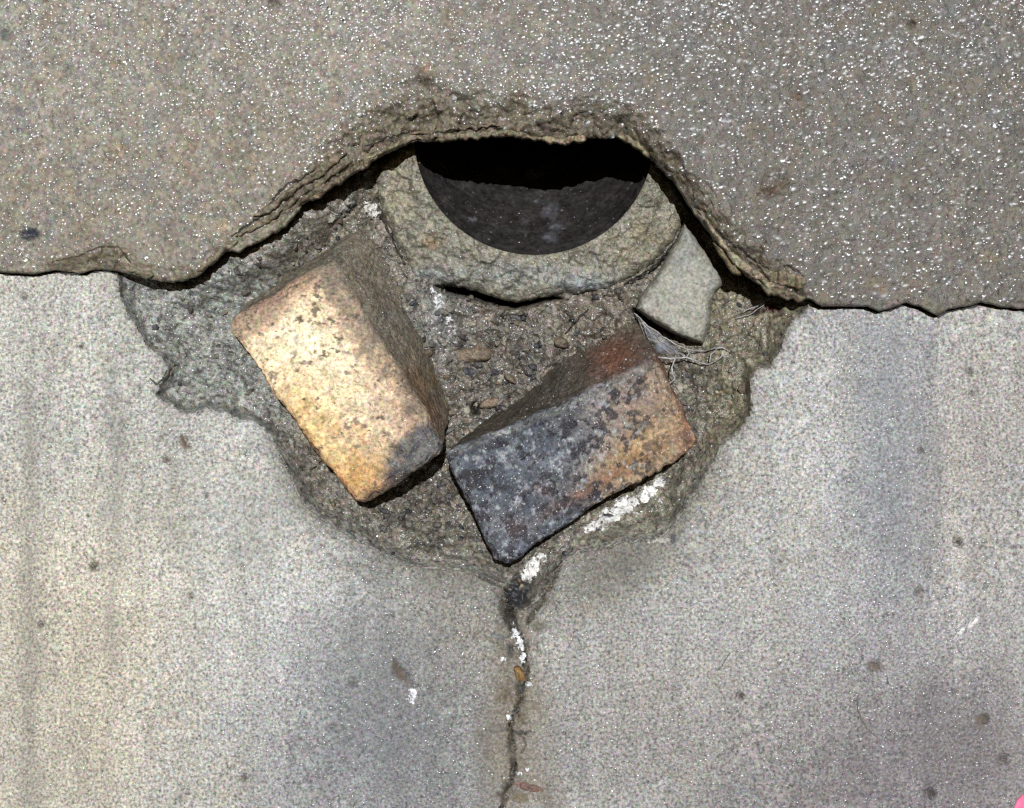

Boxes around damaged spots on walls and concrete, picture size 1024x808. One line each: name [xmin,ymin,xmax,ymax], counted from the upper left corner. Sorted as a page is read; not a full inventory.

spalling [117,122,812,611]
efflorescence [580,476,665,533]
crack [478,560,563,808]